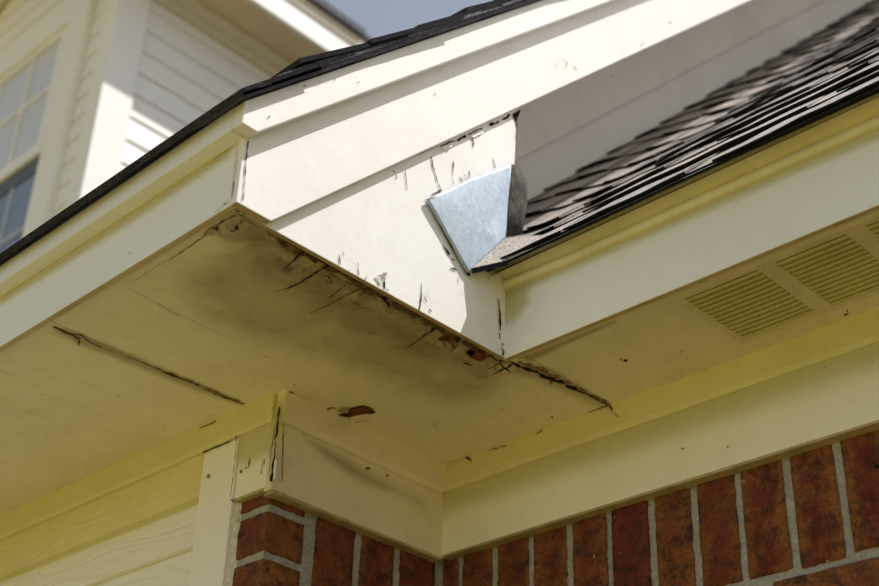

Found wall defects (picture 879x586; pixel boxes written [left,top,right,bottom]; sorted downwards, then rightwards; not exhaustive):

crack [393,109,521,200]
crack [126,141,609,406]
water stain [278,237,494,358]
crack [53,327,246,405]
crack [269,391,293,482]